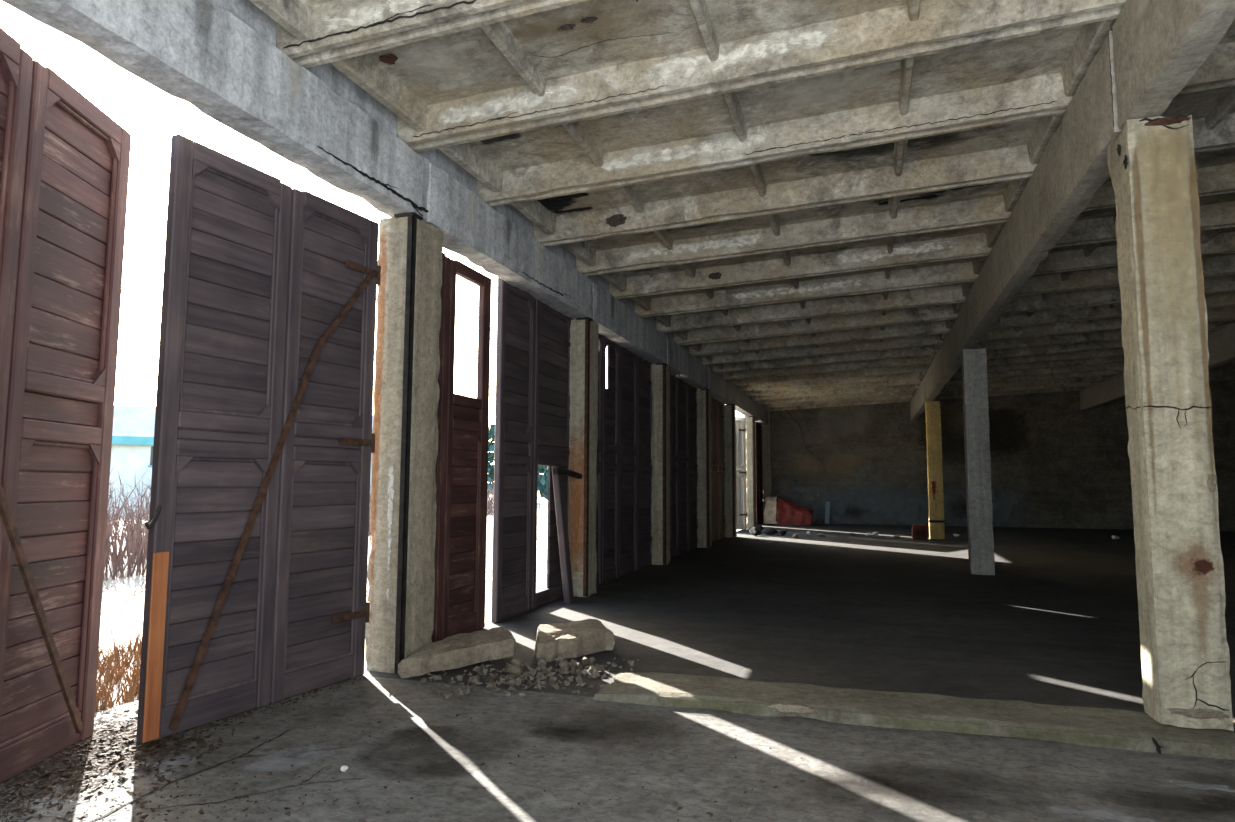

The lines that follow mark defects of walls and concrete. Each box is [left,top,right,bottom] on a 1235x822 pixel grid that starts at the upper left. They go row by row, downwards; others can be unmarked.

rust [1180,546,1214,575]
crack [1187,661,1230,711]